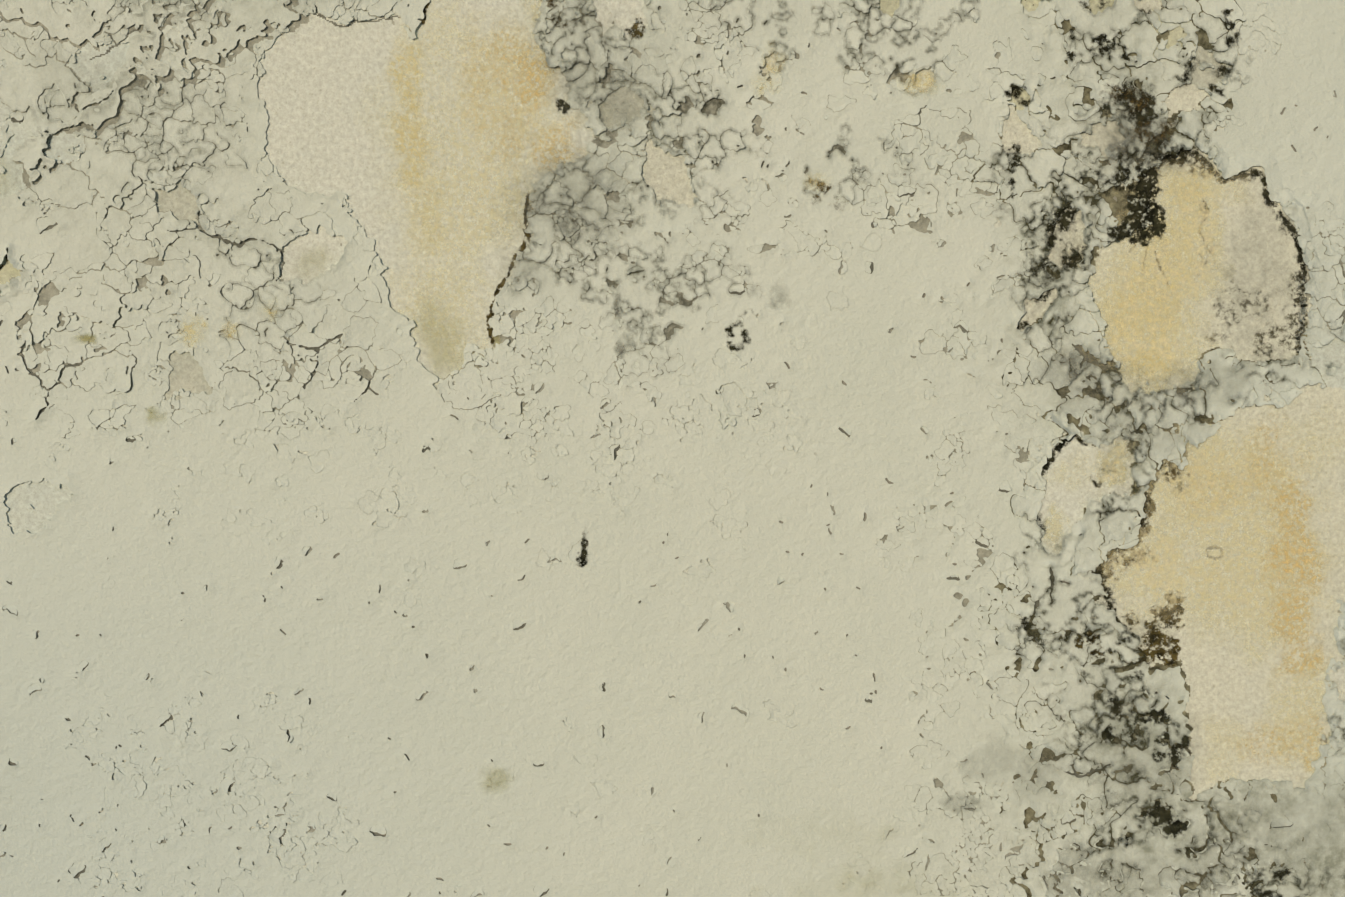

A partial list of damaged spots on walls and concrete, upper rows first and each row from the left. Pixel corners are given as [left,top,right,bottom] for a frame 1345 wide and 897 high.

leakage [1005,84,1030,106]
leakage [991,144,1031,198]
peeling [0,0,799,460]
leakage [424,168,545,344]
peeling [747,0,1345,897]
leakage [1017,81,1309,769]
peeling [3,478,73,534]
peeling [536,539,588,570]
peeling [307,792,387,852]
leakage [1092,766,1188,853]
peeling [68,837,111,888]
leakage [1232,869,1308,897]